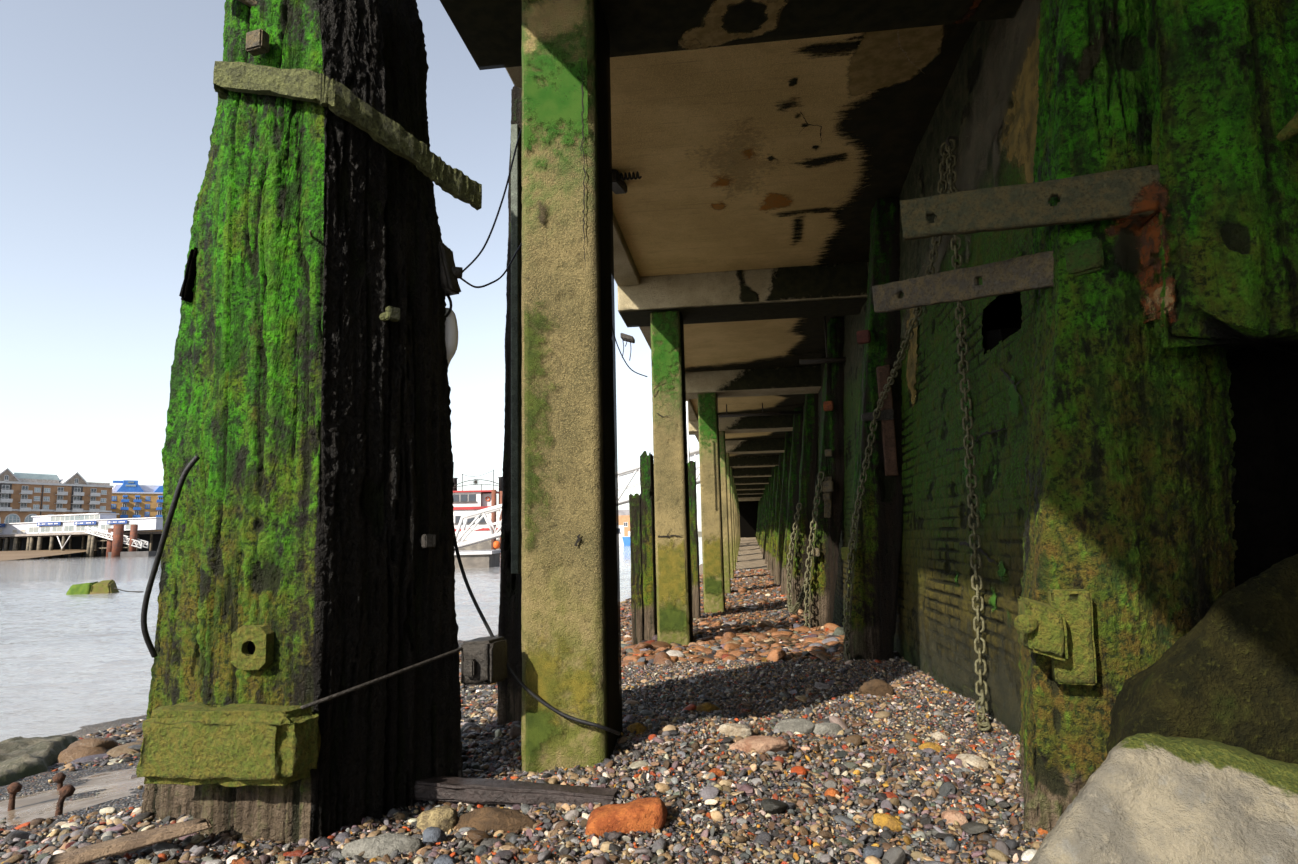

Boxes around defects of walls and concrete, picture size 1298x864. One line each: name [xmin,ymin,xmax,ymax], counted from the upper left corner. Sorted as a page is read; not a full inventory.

water stain [440,0,522,70]
peeling [678,0,787,50]
corrosion [1105,180,1177,327]
water stain [524,302,555,549]
water stain [596,0,1042,759]